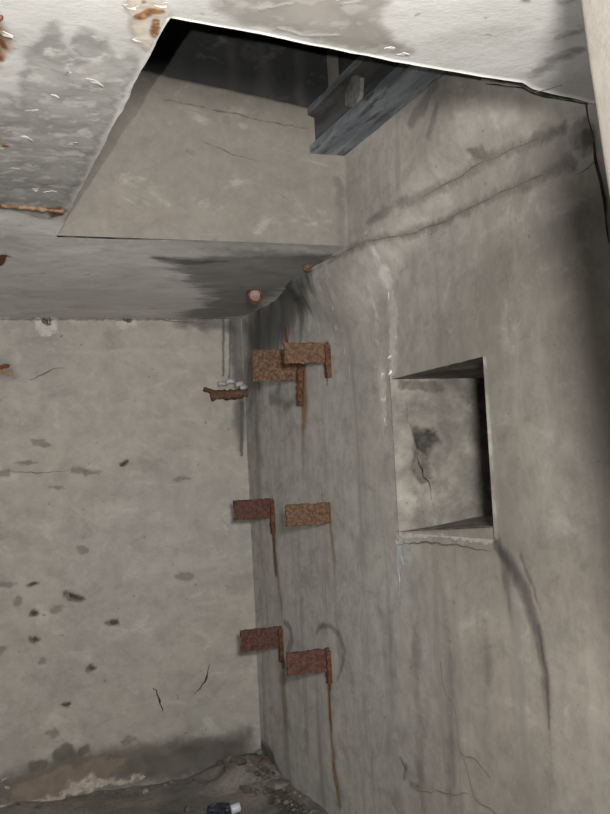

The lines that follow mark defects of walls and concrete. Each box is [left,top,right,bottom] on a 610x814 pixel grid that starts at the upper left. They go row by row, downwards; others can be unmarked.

rust [0,15,13,60]
spalling [124,0,171,51]
crack [314,79,609,266]
leakage [222,319,244,456]
leakage [0,743,90,808]
peeling [2,755,126,805]
leakage [32,732,250,802]
rust [328,670,341,806]